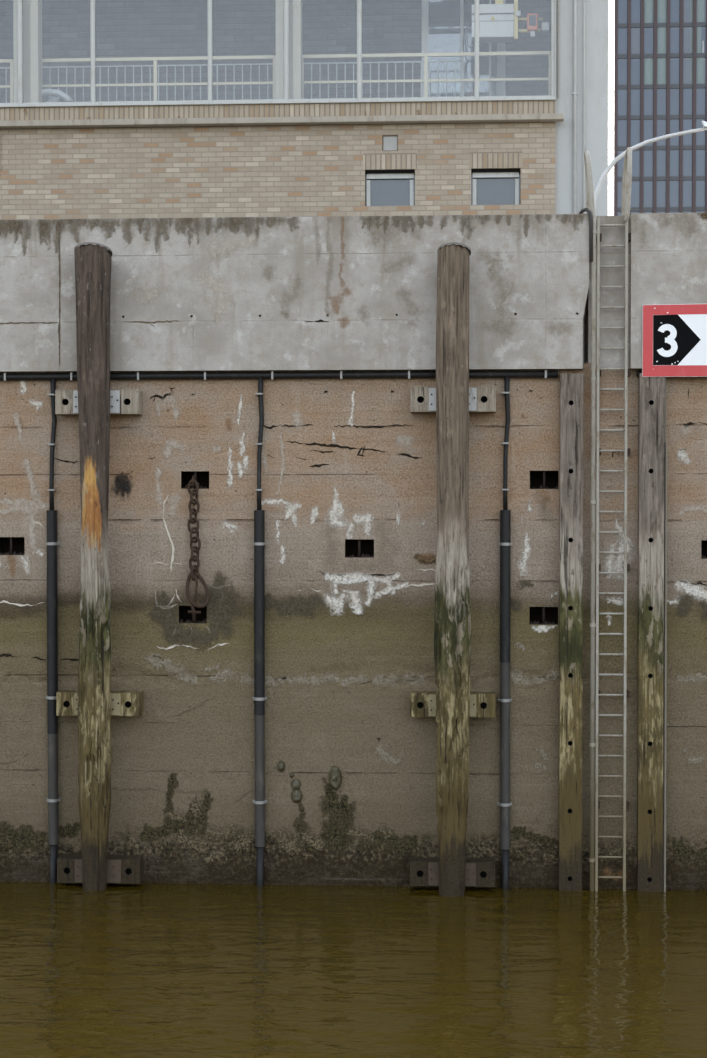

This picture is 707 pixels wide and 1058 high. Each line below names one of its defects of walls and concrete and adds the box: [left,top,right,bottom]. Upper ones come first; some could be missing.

water stain [0,217,298,257]
water stain [214,394,248,487]
crack [264,424,423,467]
water stain [0,460,49,574]
water stain [265,572,409,618]
water stain [667,581,707,619]
water stain [0,821,81,855]
water stain [139,773,213,842]
water stain [293,778,417,855]